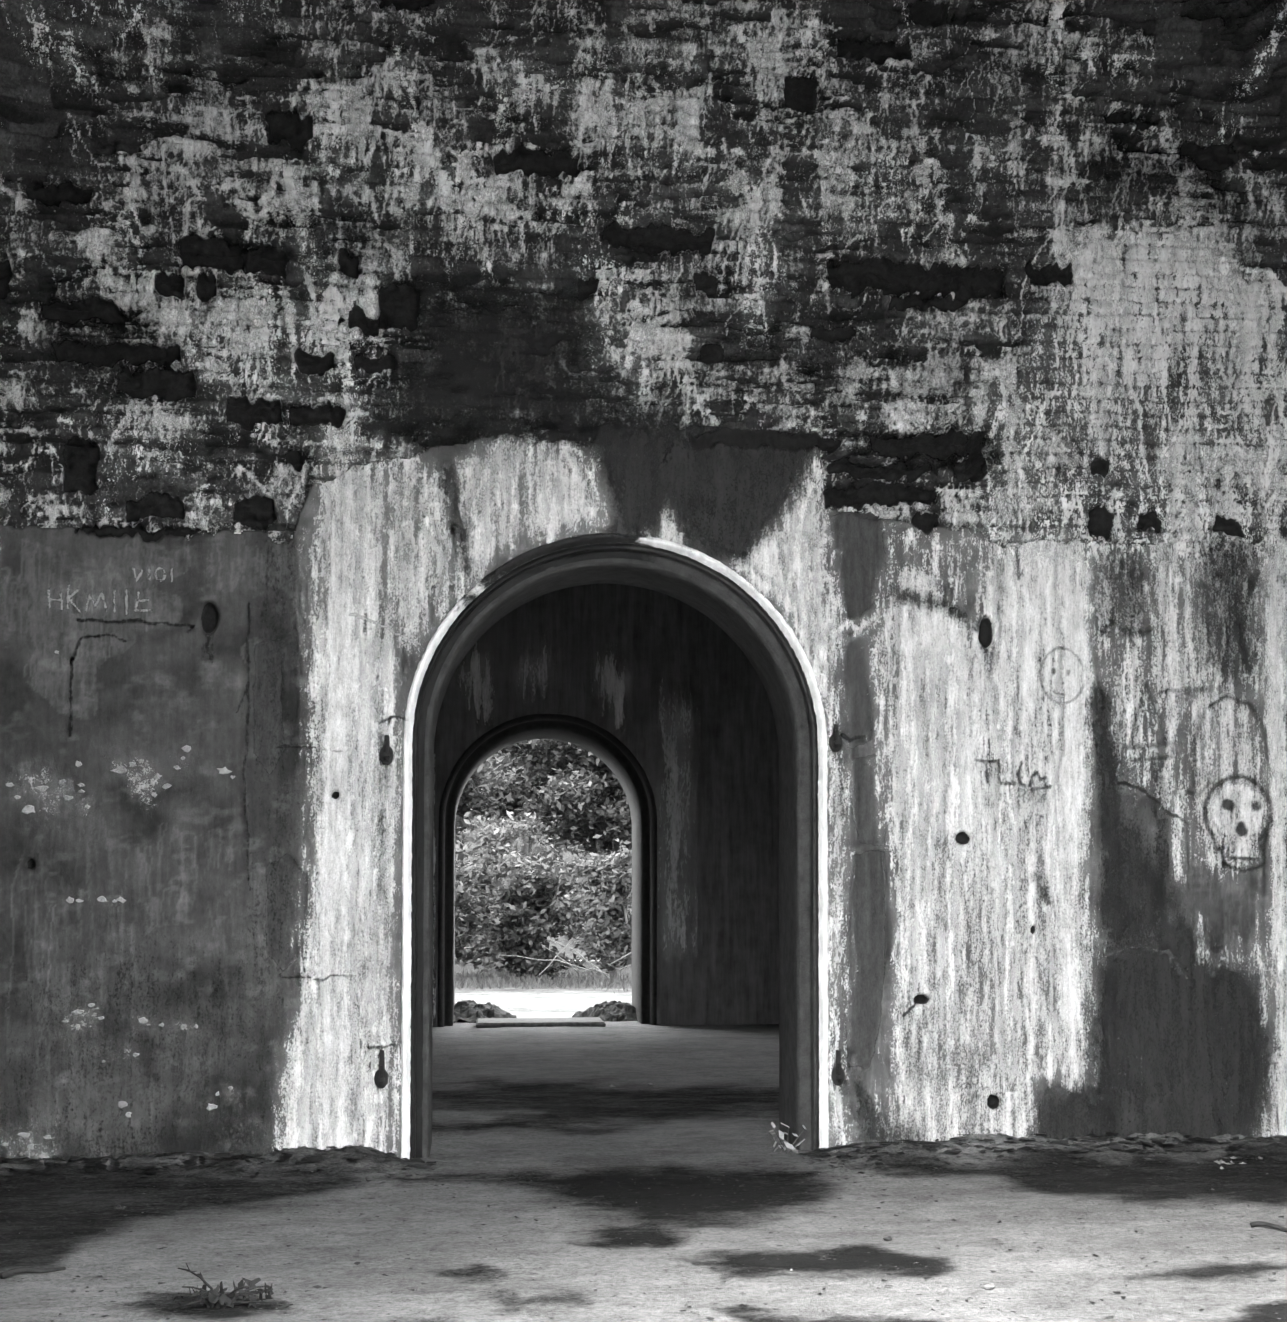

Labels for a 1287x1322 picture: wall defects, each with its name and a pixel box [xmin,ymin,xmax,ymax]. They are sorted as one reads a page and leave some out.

damp [1043,0,1155,141]
spalling [493,141,579,179]
damp [783,114,1031,262]
spalling [154,234,289,303]
spalling [348,282,420,338]
spalling [827,256,1004,312]
spalling [40,296,197,402]
spalling [225,395,346,431]
spalling [1086,505,1114,541]
damp [0,0,833,1271]
damp [731,165,1287,1204]
damp [440,1264,502,1279]